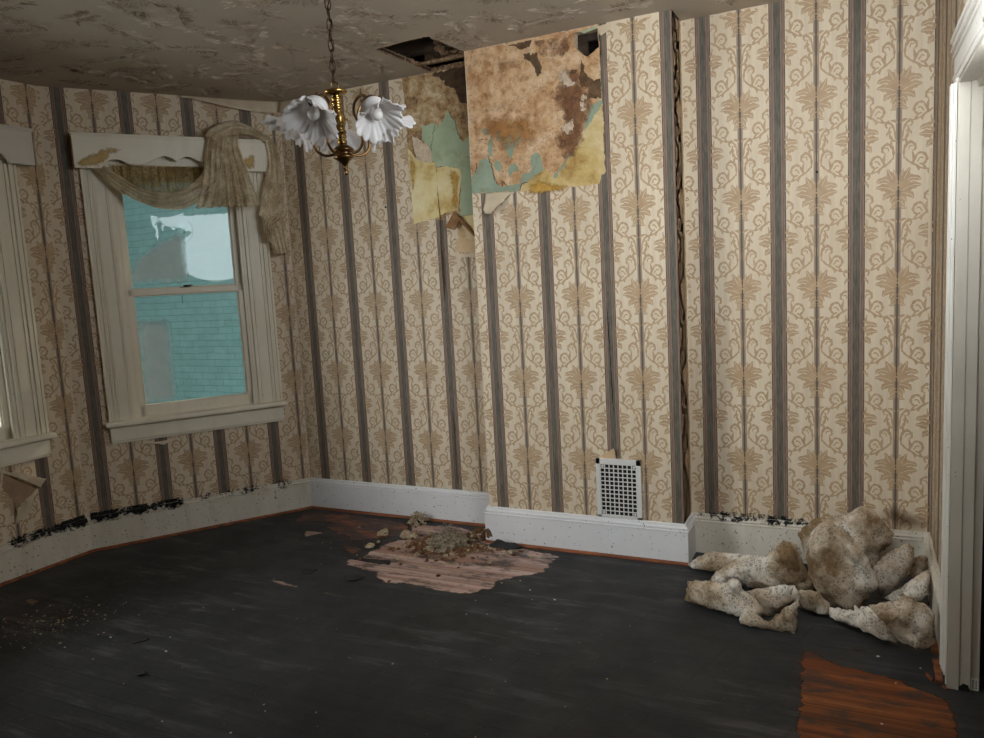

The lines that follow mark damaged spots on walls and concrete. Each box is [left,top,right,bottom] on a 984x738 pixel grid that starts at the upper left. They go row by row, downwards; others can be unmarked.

spalling [433,66,467,103]
spalling [508,40,542,77]
spalling [559,21,617,134]
peeling [482,128,543,184]
water stain [7,493,186,547]
water stain [700,511,812,526]